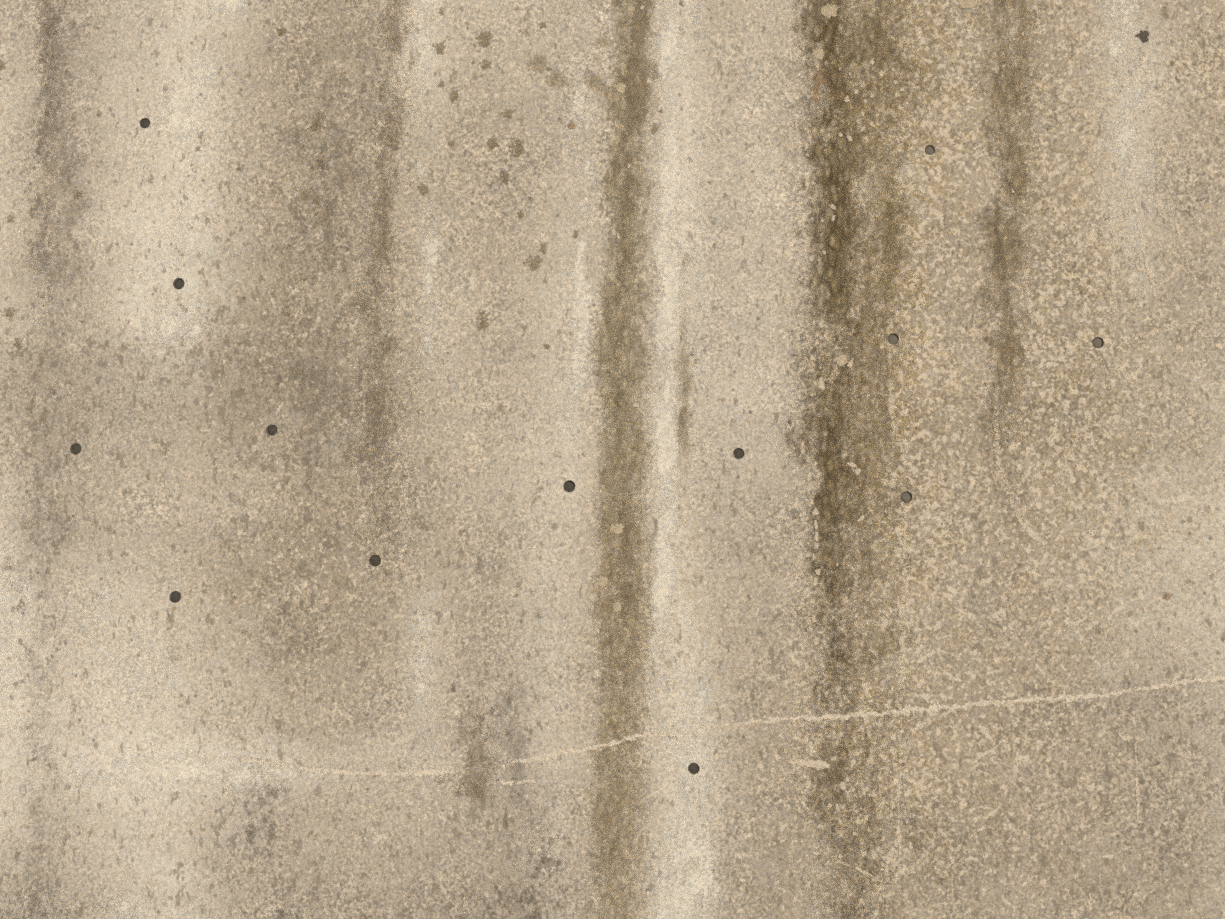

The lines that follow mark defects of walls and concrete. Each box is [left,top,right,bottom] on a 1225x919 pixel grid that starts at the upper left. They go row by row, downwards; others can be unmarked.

leakage [633,0,704,681]
leakage [786,0,899,604]
crack [188,755,469,778]
leakage [655,681,721,919]
leakage [819,750,882,810]
crack [499,675,1225,786]
leakage [884,509,908,743]